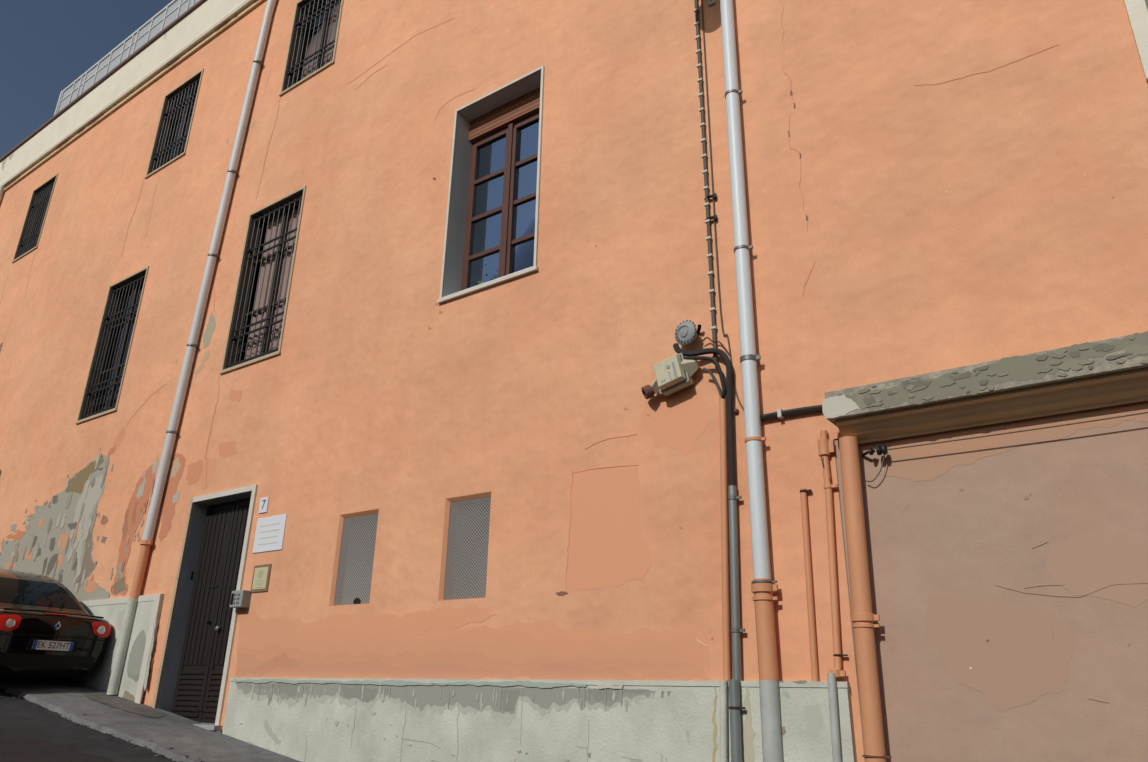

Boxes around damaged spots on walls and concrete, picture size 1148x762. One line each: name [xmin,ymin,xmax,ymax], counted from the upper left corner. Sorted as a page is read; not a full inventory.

crack [781,7,808,232]
spalling [0,447,203,601]
crack [1000,583,1142,597]
damp [236,682,670,762]